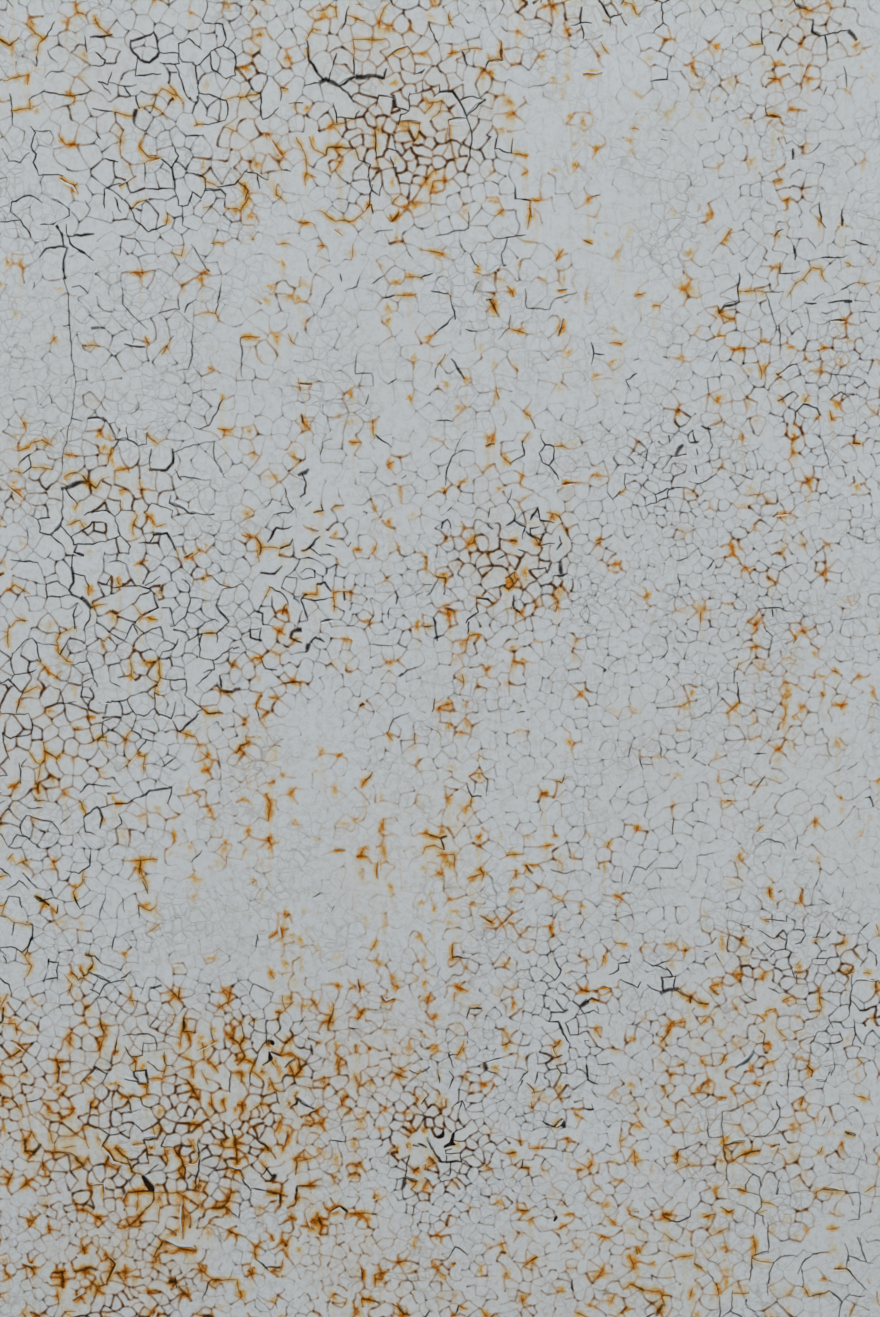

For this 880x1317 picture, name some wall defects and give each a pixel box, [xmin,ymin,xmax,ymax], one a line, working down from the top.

crack [0,0,535,377]
crack [531,286,567,336]
crack [516,0,669,39]
crack [712,110,874,454]
crack [761,0,855,76]
crack [0,383,880,1317]